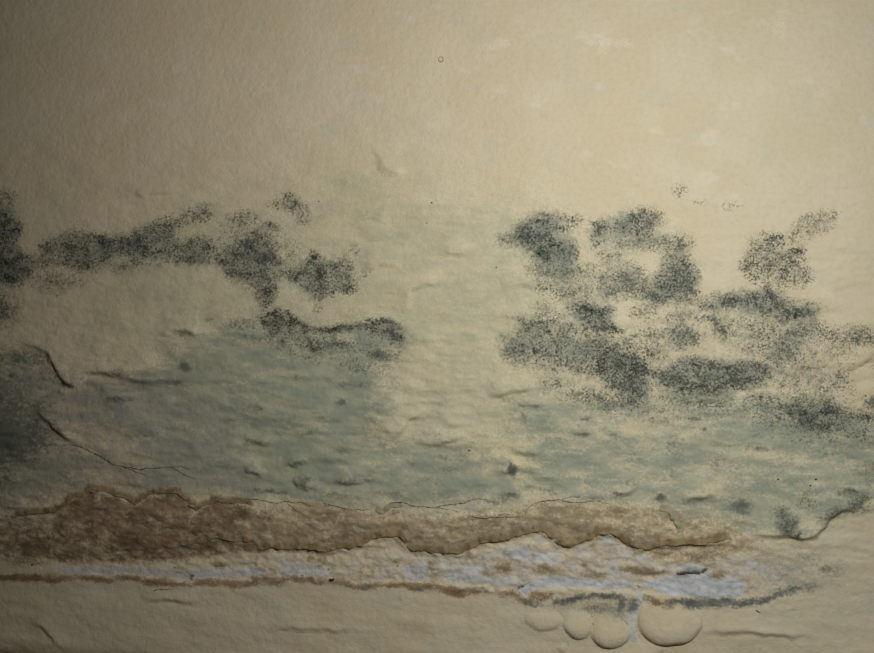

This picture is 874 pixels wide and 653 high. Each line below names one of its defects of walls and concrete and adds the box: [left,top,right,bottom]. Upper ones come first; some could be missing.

leakage [0,178,874,610]
crack [63,445,197,480]
peeling [11,483,253,518]
spalling [34,503,784,600]
leakage [553,586,646,645]